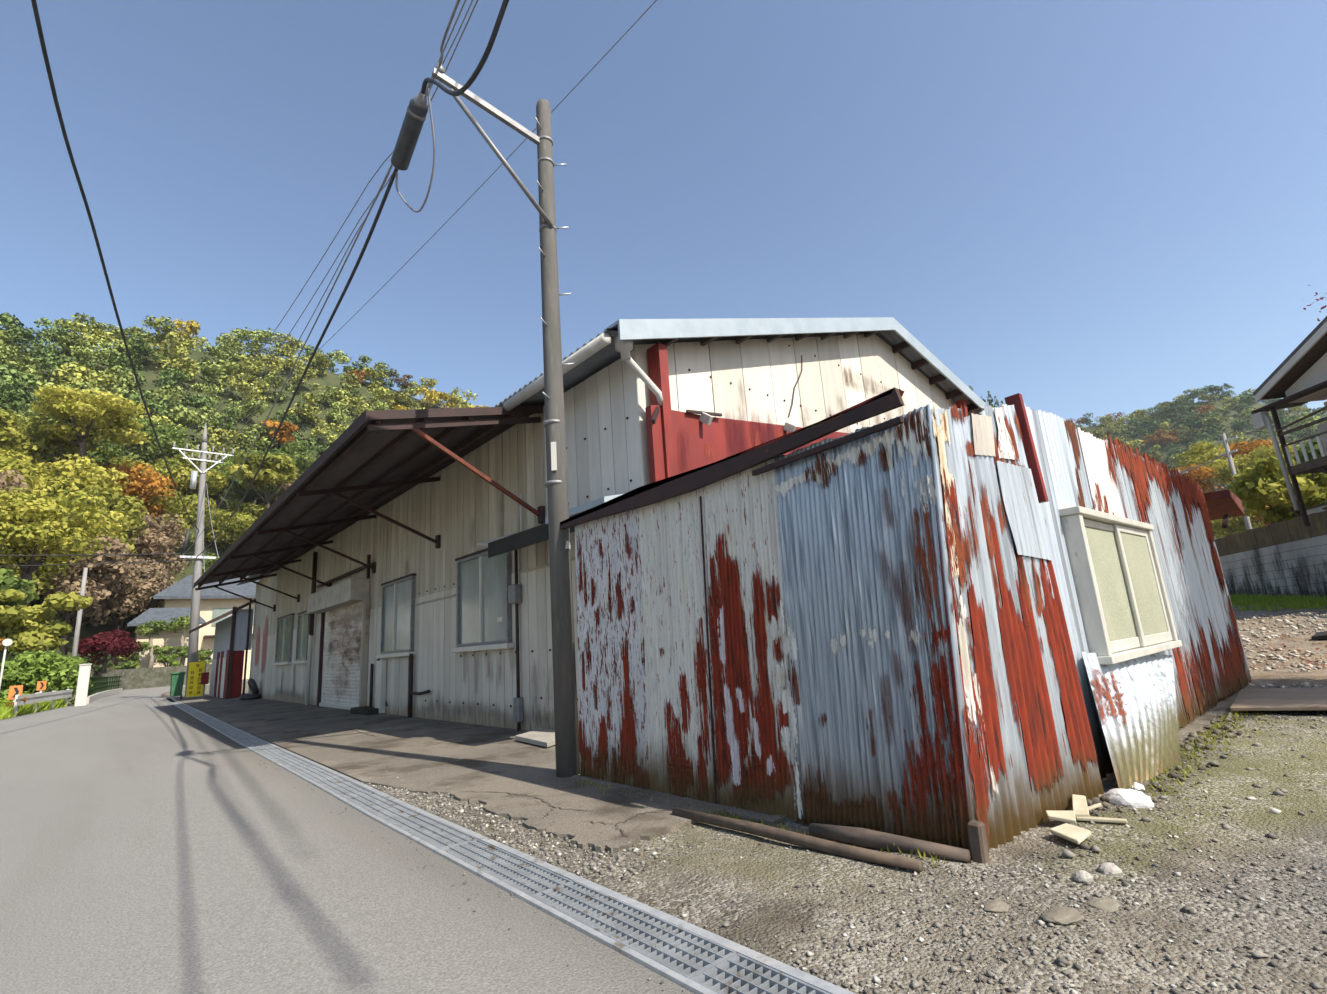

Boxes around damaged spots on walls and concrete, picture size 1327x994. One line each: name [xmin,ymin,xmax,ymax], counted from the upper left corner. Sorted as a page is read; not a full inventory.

rust [577,404,1133,854]
rust [1064,420,1249,723]
crack [461,791,673,838]